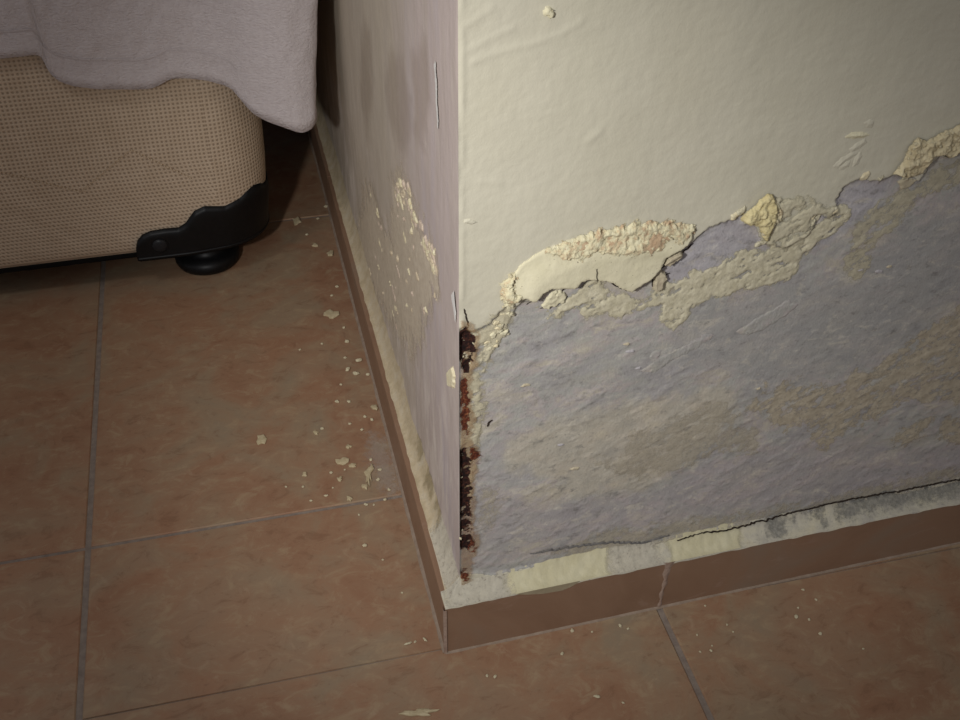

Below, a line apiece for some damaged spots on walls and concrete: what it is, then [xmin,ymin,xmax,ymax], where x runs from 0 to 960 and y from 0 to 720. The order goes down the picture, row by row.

peeling [357,171,439,357]
corrosion [460,326,476,435]
peeling [446,125,960,575]
corrosion [459,447,480,553]
crack [530,479,960,554]